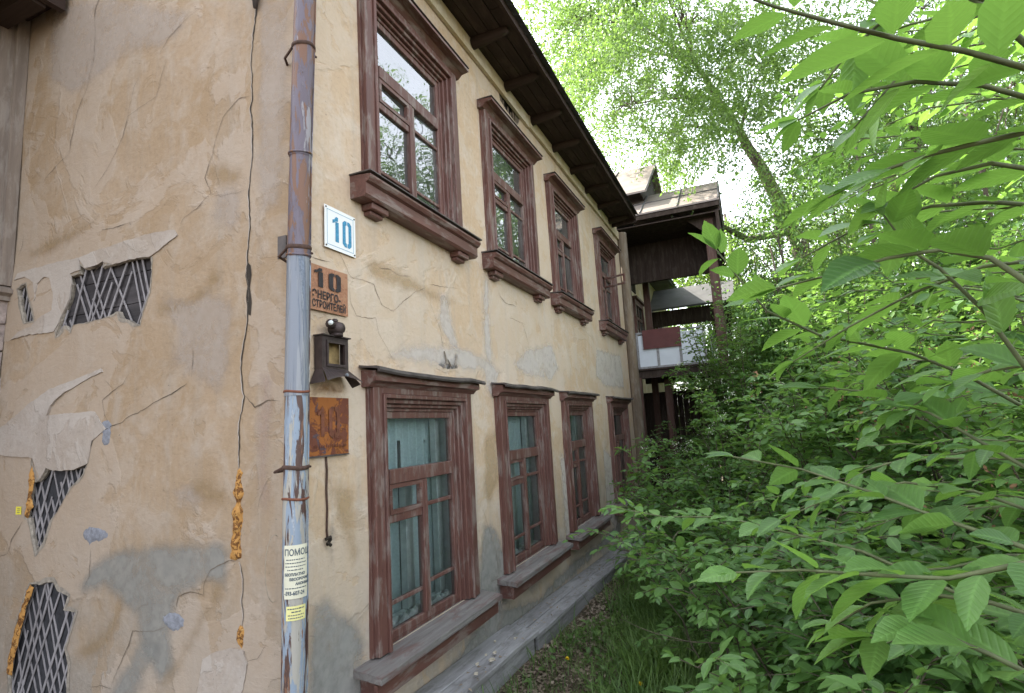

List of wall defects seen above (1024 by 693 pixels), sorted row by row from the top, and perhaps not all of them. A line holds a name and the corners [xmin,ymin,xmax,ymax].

flaking render [11,230,178,340]
crack [179,9,277,468]
crack [313,255,448,351]
crack [90,347,193,449]
flaking render [0,368,106,557]
flaking render [7,577,78,693]
leakage [84,547,225,693]